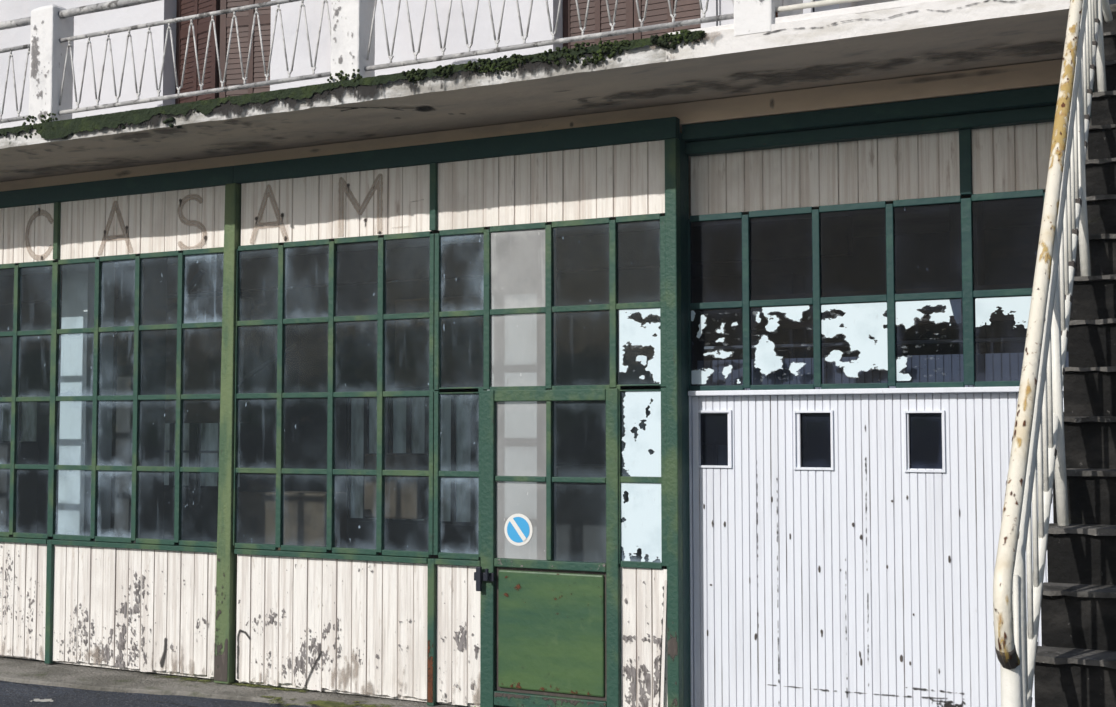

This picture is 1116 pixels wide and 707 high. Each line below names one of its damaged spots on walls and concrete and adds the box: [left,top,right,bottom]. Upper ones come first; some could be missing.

damp [80,108,196,136]
damp [209,83,383,116]
damp [517,57,570,76]
damp [581,59,912,108]
damp [927,42,1064,78]
rust [1049,0,1082,172]
rust [1040,243,1052,284]
peeling [691,310,741,384]
peeling [754,300,953,381]
peeling [619,308,662,563]
peeling [56,570,165,668]
peeling [622,584,678,707]